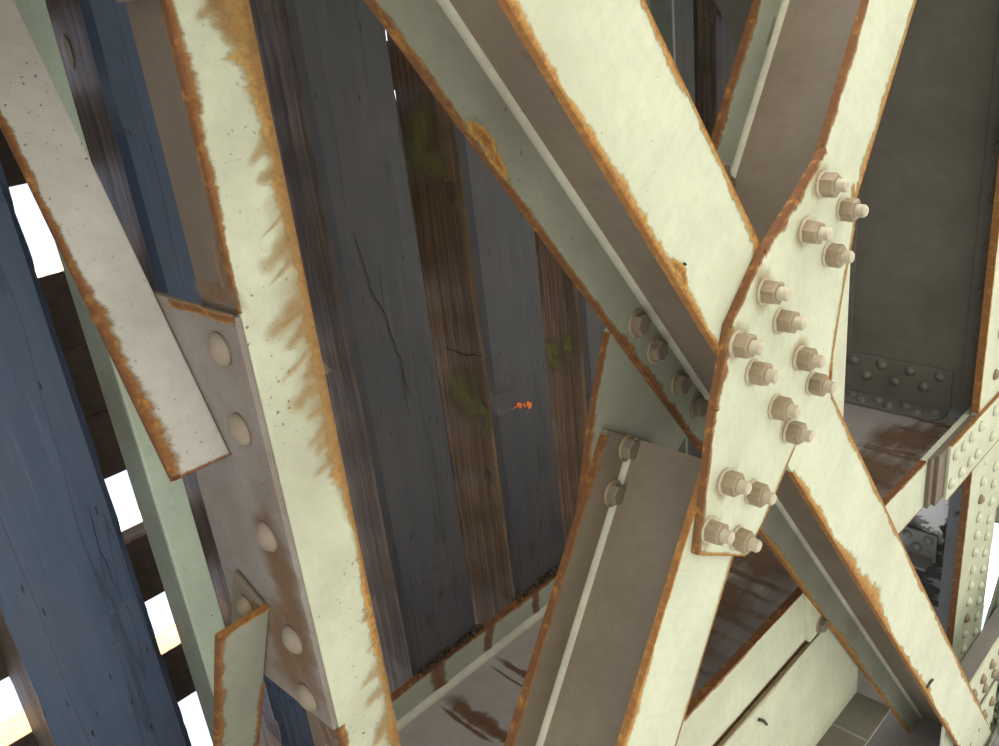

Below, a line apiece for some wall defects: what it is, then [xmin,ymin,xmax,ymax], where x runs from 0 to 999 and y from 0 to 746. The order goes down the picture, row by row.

corrosion [0,110,231,482]
corrosion [160,0,242,325]
crack [353,230,410,413]
corrosion [203,0,917,746]
corrosion [775,445,961,746]
corrosion [831,159,999,732]